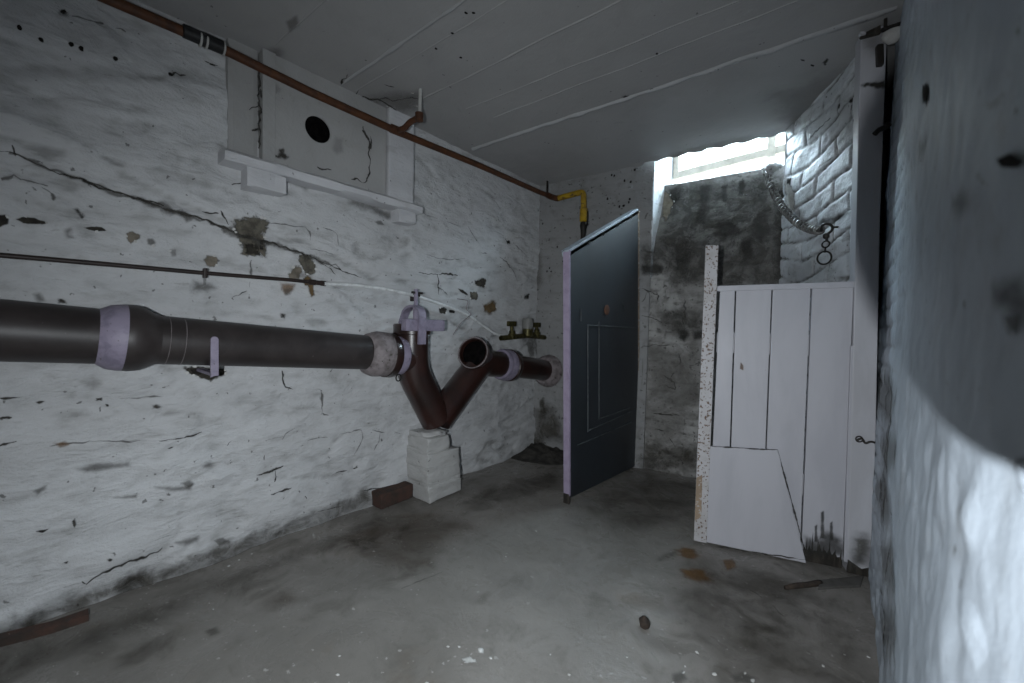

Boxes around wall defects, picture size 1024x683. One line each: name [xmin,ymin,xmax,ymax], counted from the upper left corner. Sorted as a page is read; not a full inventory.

crack [249,72,262,148]
crack [318,128,372,183]
peeling [124,232,155,247]
crack [0,145,362,300]
peeling [204,255,218,267]
spalling [232,216,269,257]
spalling [288,254,317,279]
damp [642,178,784,285]
damp [806,512,843,555]
crack [82,548,162,585]